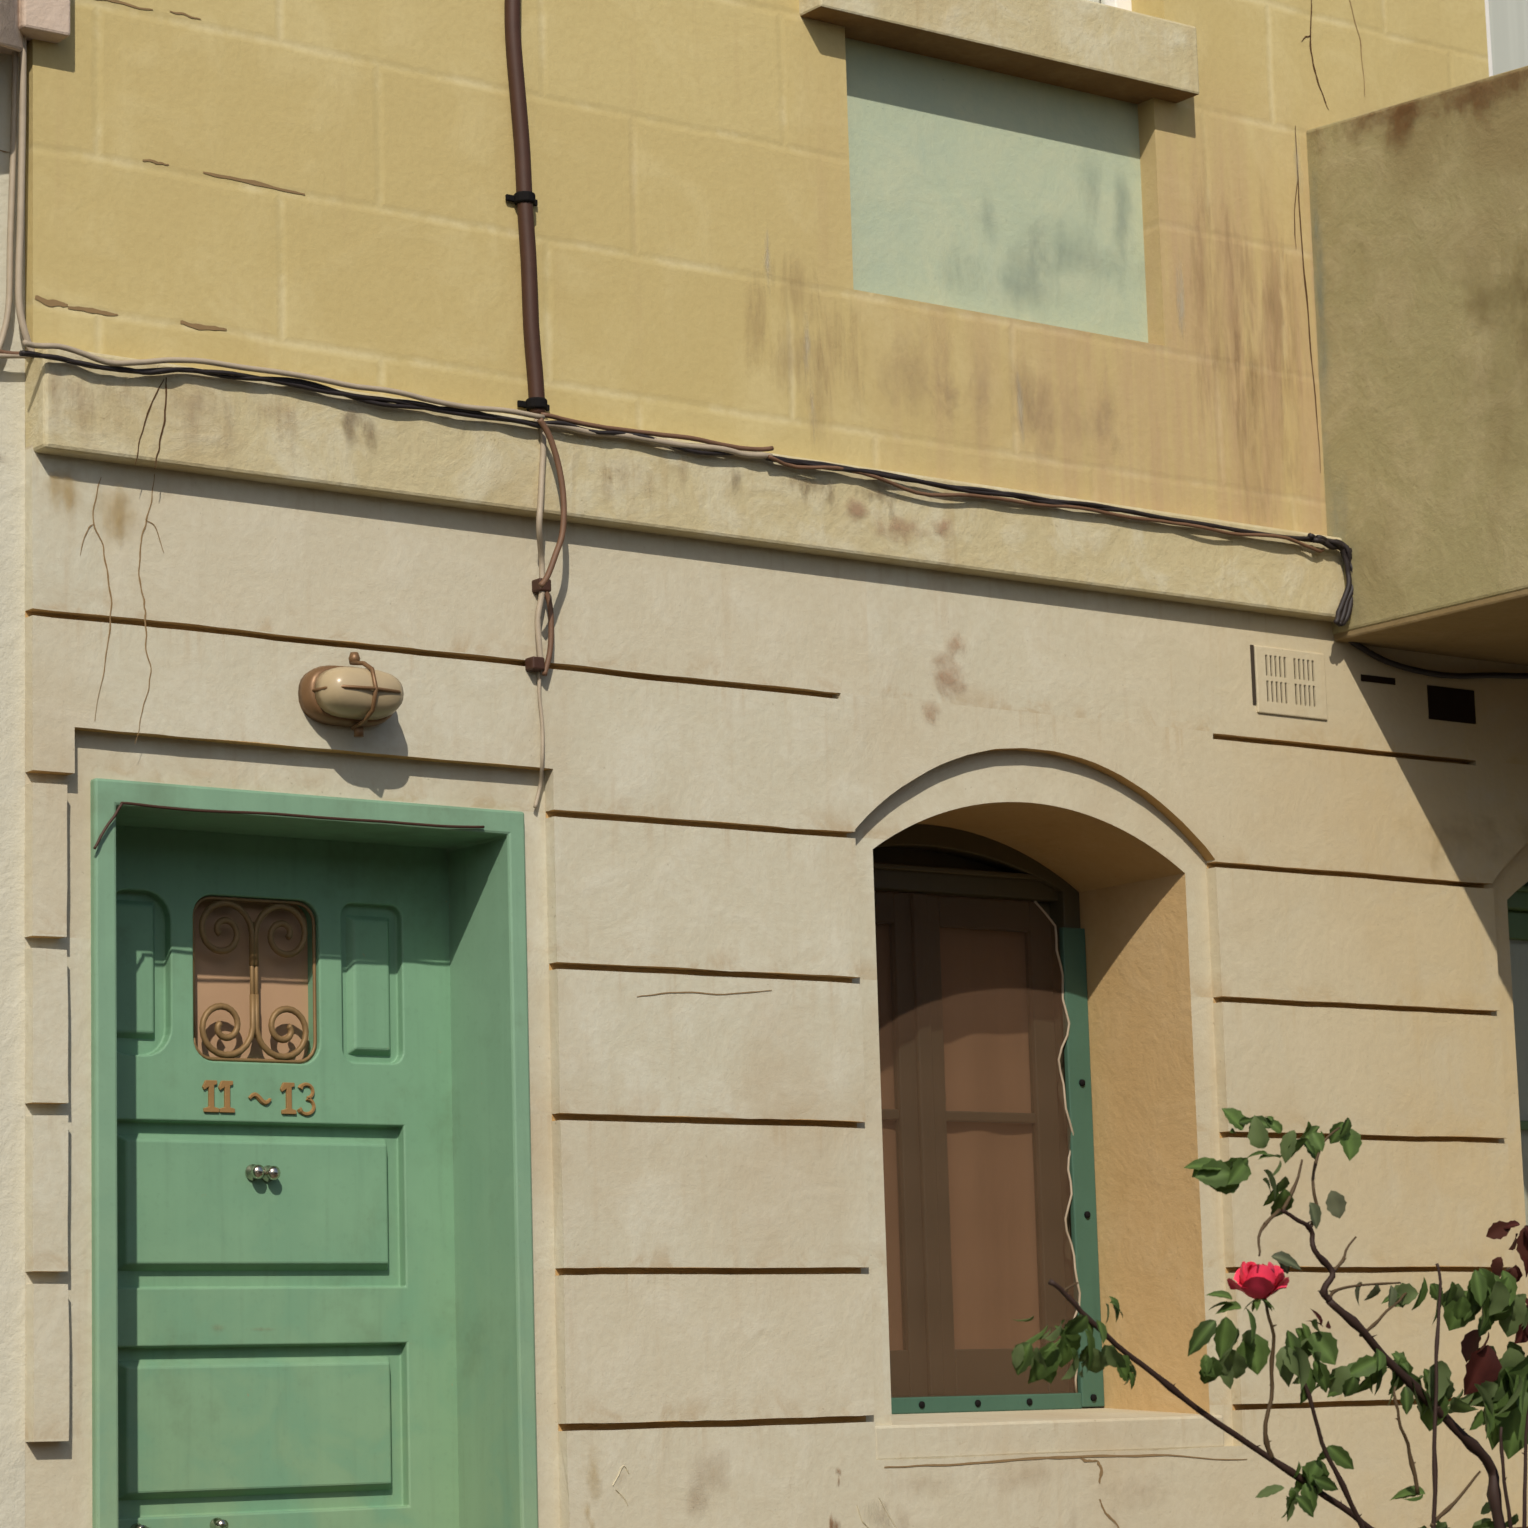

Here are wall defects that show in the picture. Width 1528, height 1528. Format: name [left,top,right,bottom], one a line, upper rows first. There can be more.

crack [1302,0,1329,110]
crack [1349,0,1365,94]
crack [143,159,305,195]
crack [35,295,118,316]
crack [1294,126,1321,473]
crack [80,377,167,742]
crack [884,1454,1247,1528]